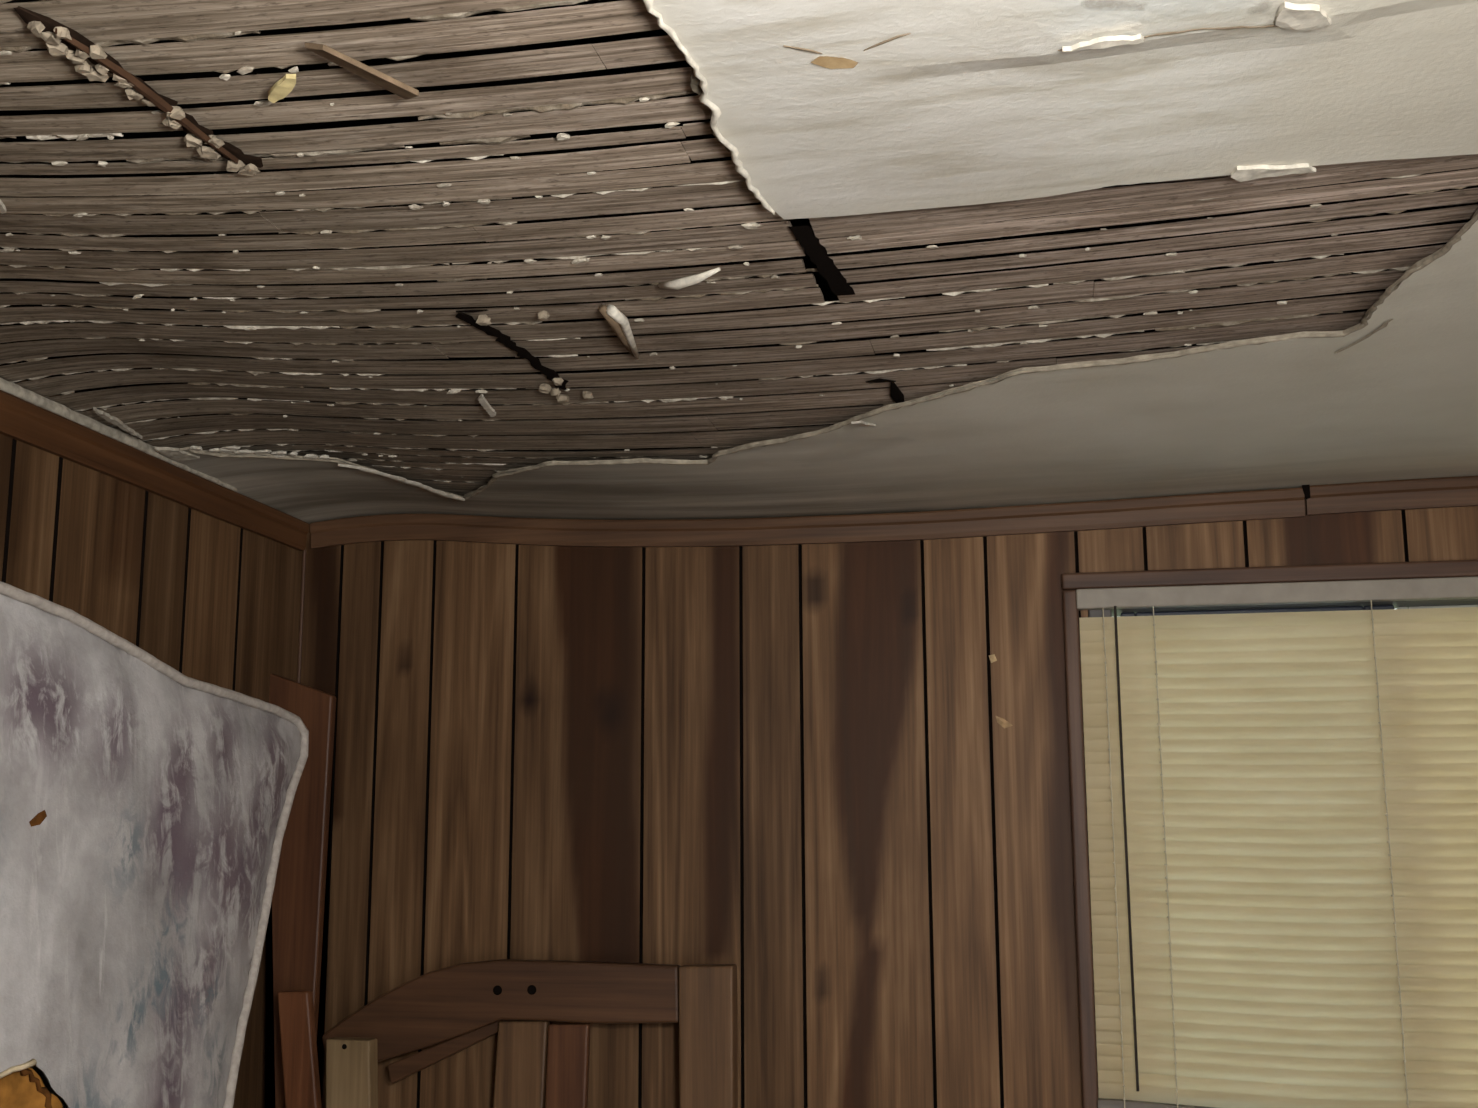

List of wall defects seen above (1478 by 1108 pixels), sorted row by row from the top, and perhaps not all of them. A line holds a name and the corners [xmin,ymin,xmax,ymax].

flaking render [268,74,296,103]
flaking render [643,0,775,215]
peeling [811,56,858,69]
flaking render [1102,163,1316,188]
crack [455,309,593,403]
flaking render [0,214,1478,501]